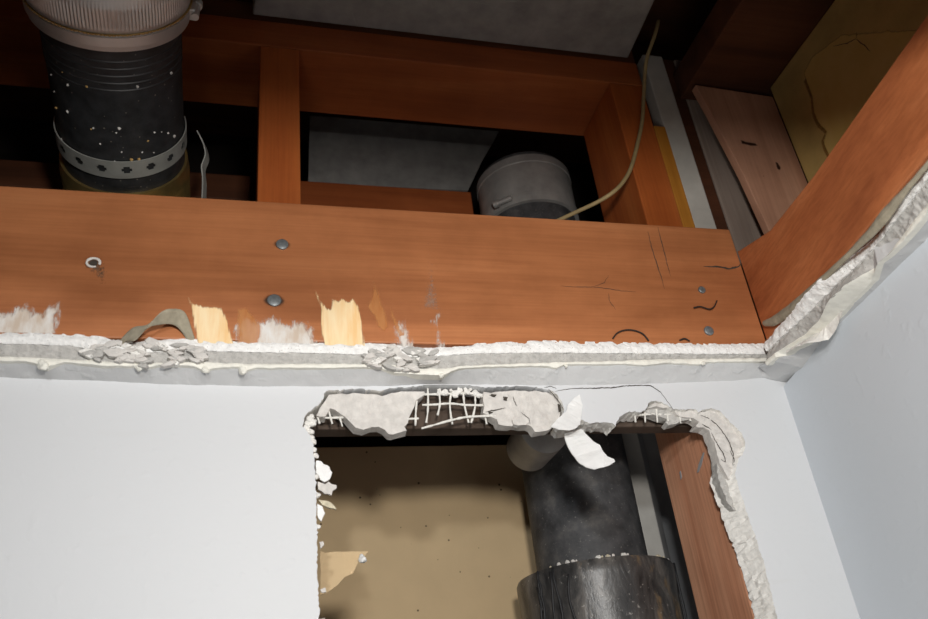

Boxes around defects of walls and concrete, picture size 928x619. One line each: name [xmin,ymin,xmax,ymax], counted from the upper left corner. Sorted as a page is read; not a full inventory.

flaking render [0,160,928,380]
crack [648,228,671,289]
crack [703,262,742,270]
flaking render [303,391,425,529]
flaking render [480,390,615,470]
flaking render [639,403,743,512]